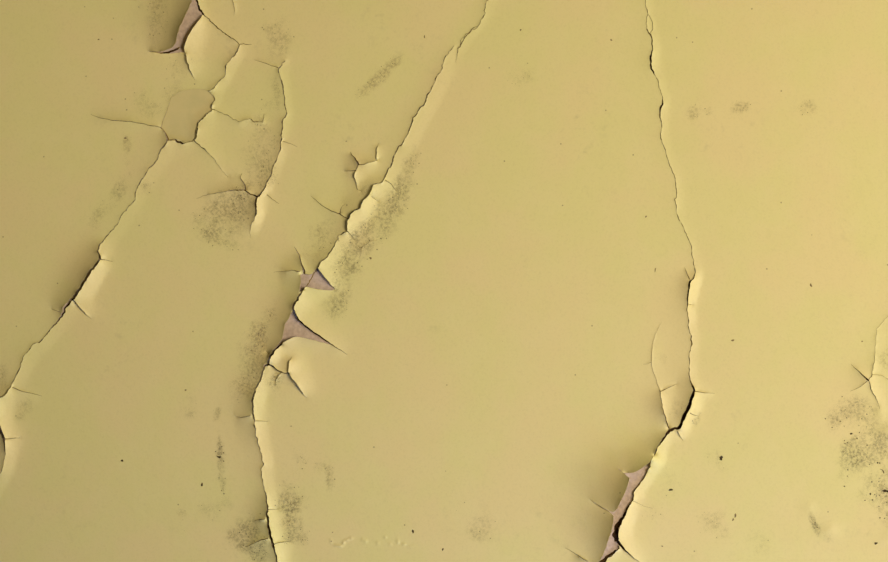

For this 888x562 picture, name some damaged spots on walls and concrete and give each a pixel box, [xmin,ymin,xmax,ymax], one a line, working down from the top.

crack [0,0,295,498]
peeling [243,228,354,405]
crack [845,314,888,409]
peeling [523,399,684,562]